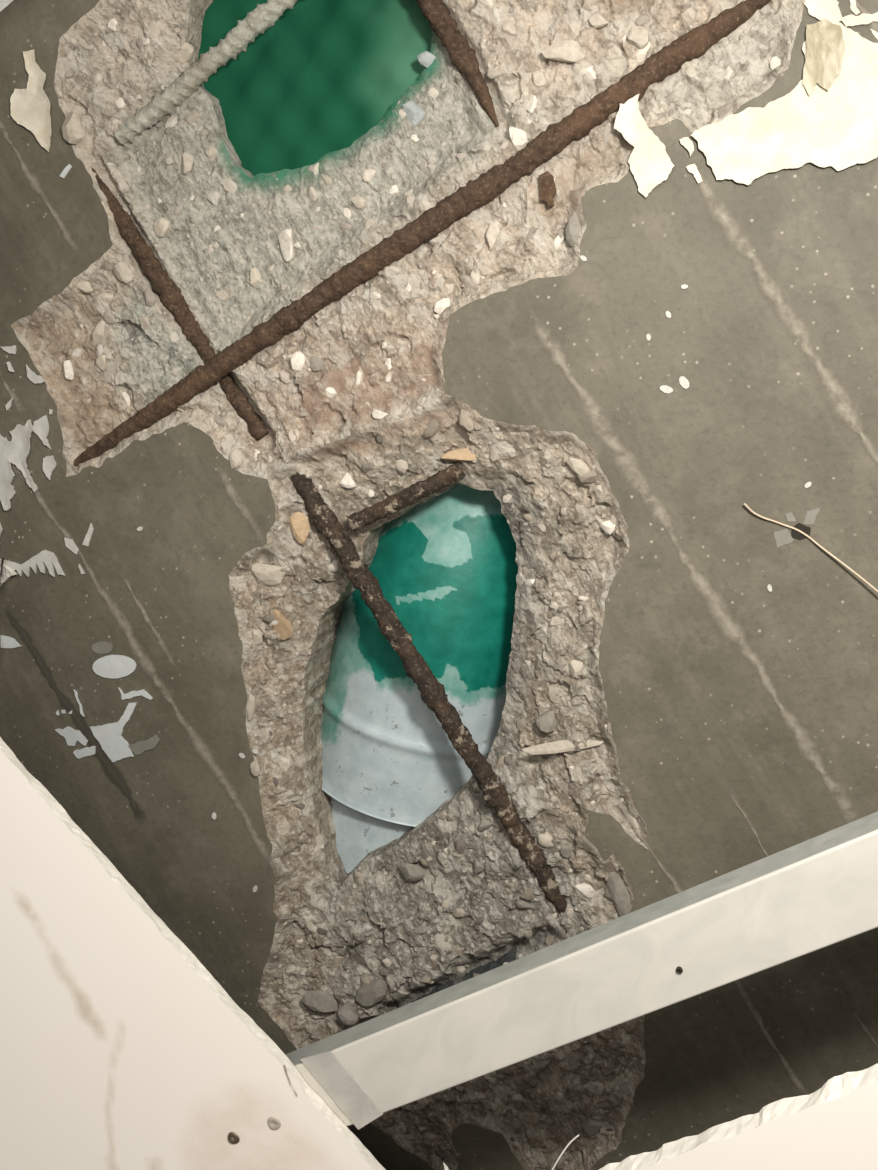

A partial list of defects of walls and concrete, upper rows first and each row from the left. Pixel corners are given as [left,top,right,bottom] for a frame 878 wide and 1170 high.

spalling [10,0,878,480]
rust [539,171,557,208]
peeling [0,409,54,511]
peeling [0,561,17,587]
spalling [229,393,649,1049]
spalling [370,1015,646,1170]